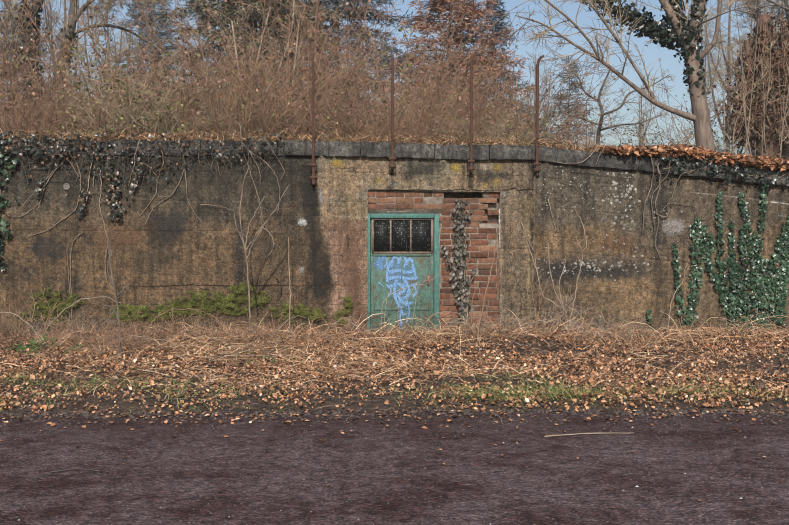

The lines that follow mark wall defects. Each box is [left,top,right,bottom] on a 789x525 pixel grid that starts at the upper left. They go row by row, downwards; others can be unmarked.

water stain [299,167,330,306]
water stain [547,264,626,278]